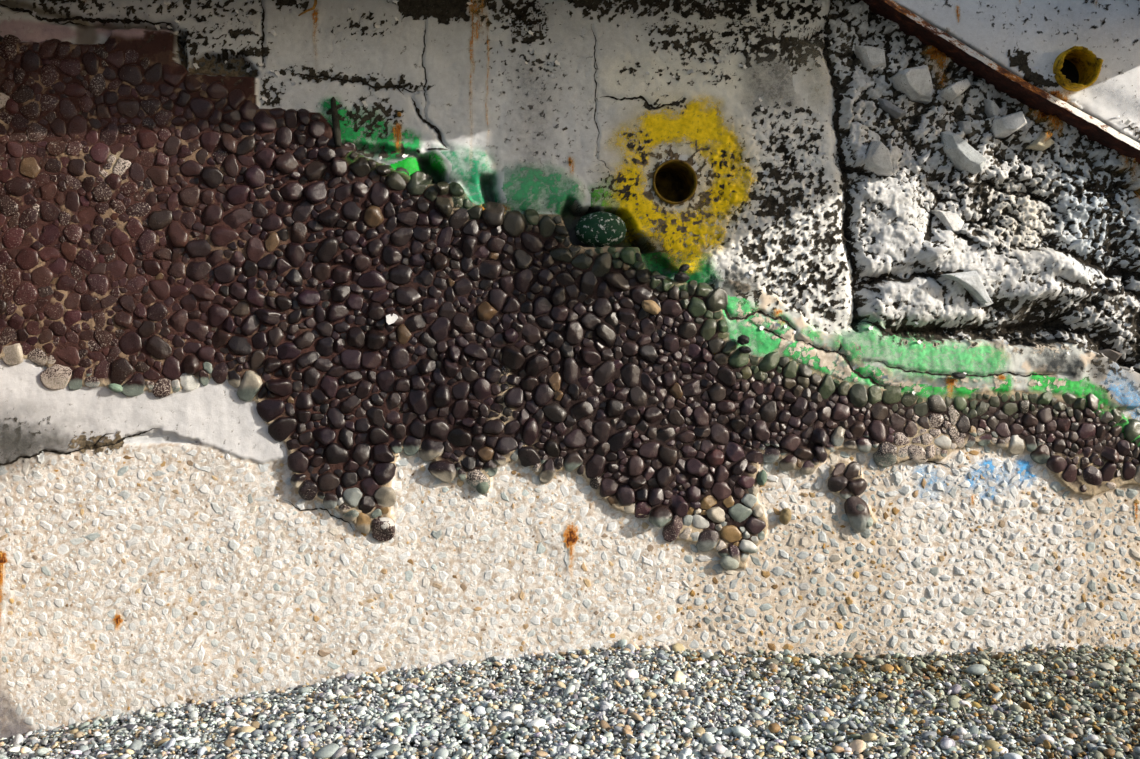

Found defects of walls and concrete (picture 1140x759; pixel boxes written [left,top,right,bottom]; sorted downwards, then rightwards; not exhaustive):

crack [261,2,449,150]
crack [591,28,683,169]
spalling [933,0,1140,90]
rust [1028,89,1076,141]
crack [724,1,1140,387]
crack [0,428,158,465]
rust [563,522,578,563]